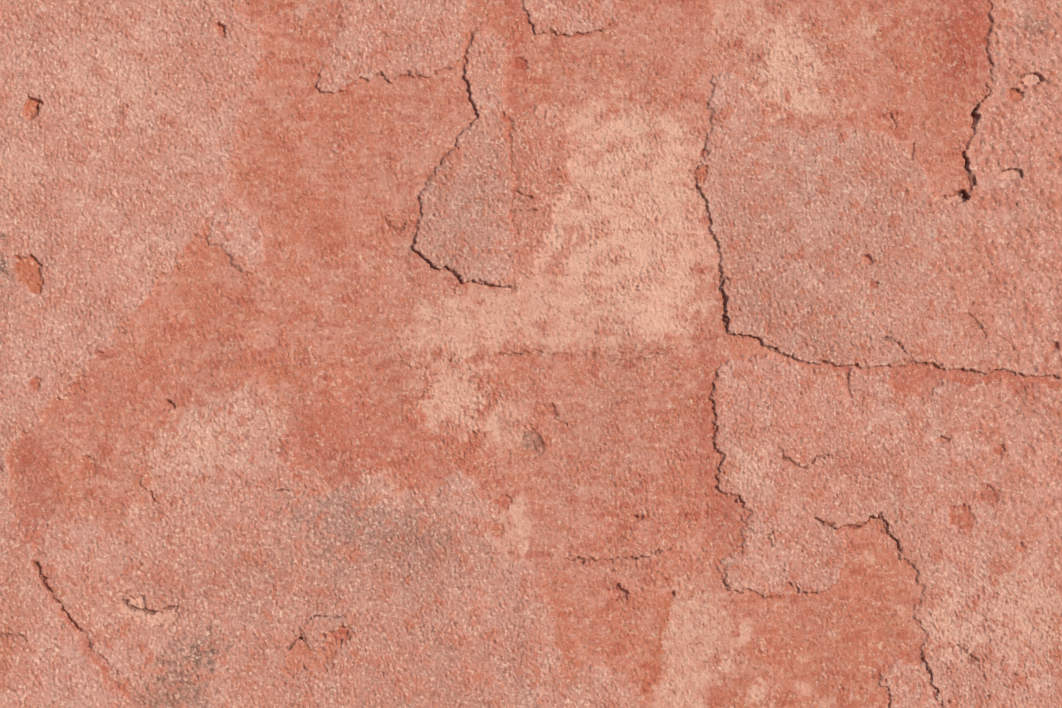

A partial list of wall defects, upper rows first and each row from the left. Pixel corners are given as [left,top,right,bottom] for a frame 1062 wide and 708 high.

spalling [18,96,45,122]
crack [957,108,1025,203]
crack [384,214,412,231]
peeling [28,0,1045,411]
spalling [13,252,46,295]
crack [379,277,1062,381]
peeling [489,163,950,708]
spalling [946,484,1003,535]
crack [26,552,151,708]
crack [115,589,178,615]
spalling [117,594,183,634]
crack [920,652,943,708]